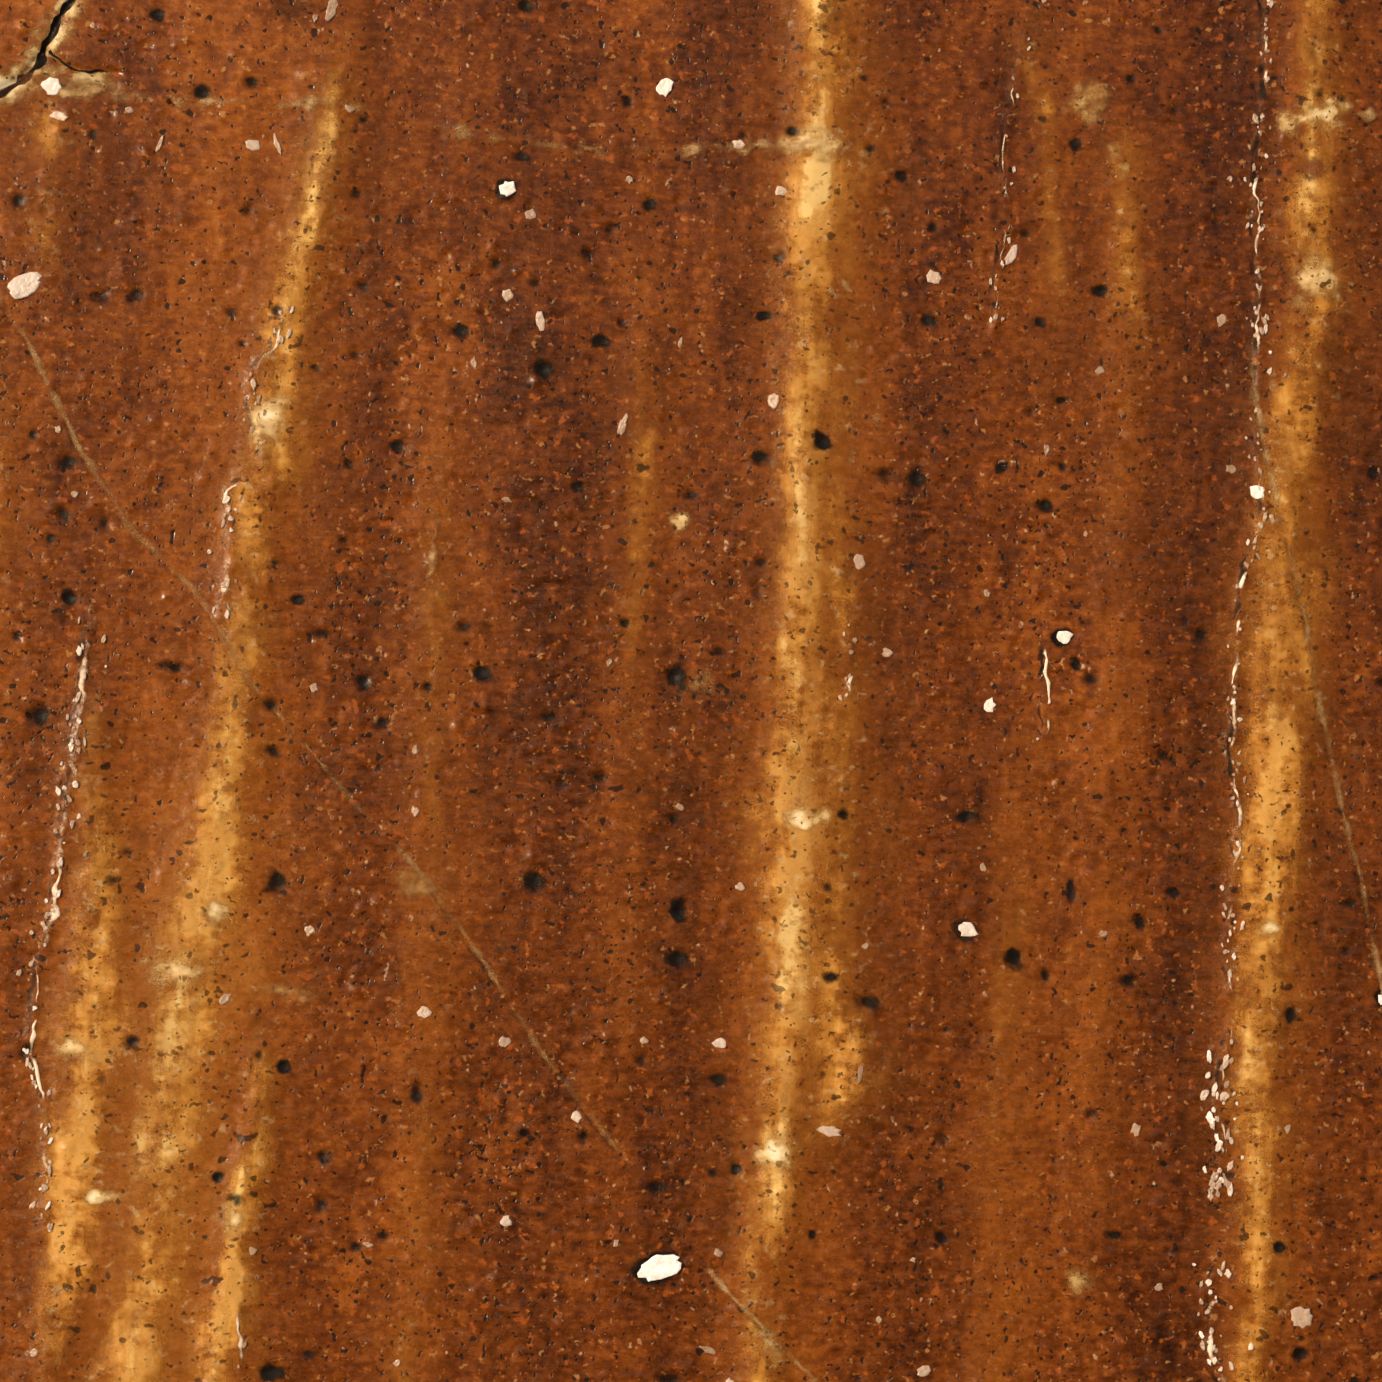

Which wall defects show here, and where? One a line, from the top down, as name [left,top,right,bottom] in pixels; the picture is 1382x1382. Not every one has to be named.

crack [0,0,106,104]
rust [1023,61,1055,119]
rust [1109,143,1145,318]
rust [627,430,655,631]
rust [30,73,348,1382]
rust [739,0,884,1382]
rust [1225,0,1342,1382]